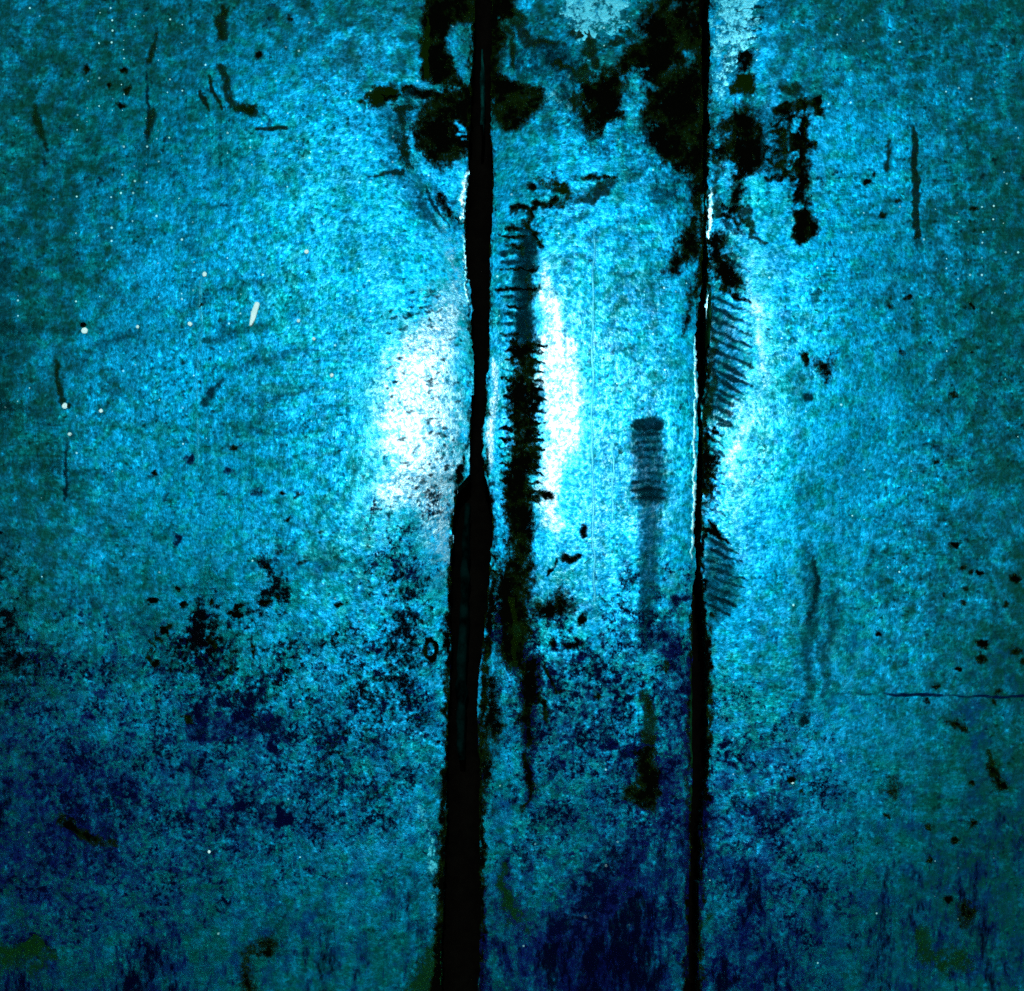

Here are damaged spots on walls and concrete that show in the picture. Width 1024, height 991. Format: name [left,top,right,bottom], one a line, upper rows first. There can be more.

water stain [368,16,446,178]
water stain [461,0,474,241]
water stain [491,2,636,112]
water stain [736,47,754,73]
water stain [761,127,795,182]
water stain [449,372,474,549]
crack [441,0,494,991]
water stain [477,229,543,991]
water stain [631,417,667,651]
crack [686,0,712,991]
water stain [679,125,768,991]
water stain [427,565,451,991]